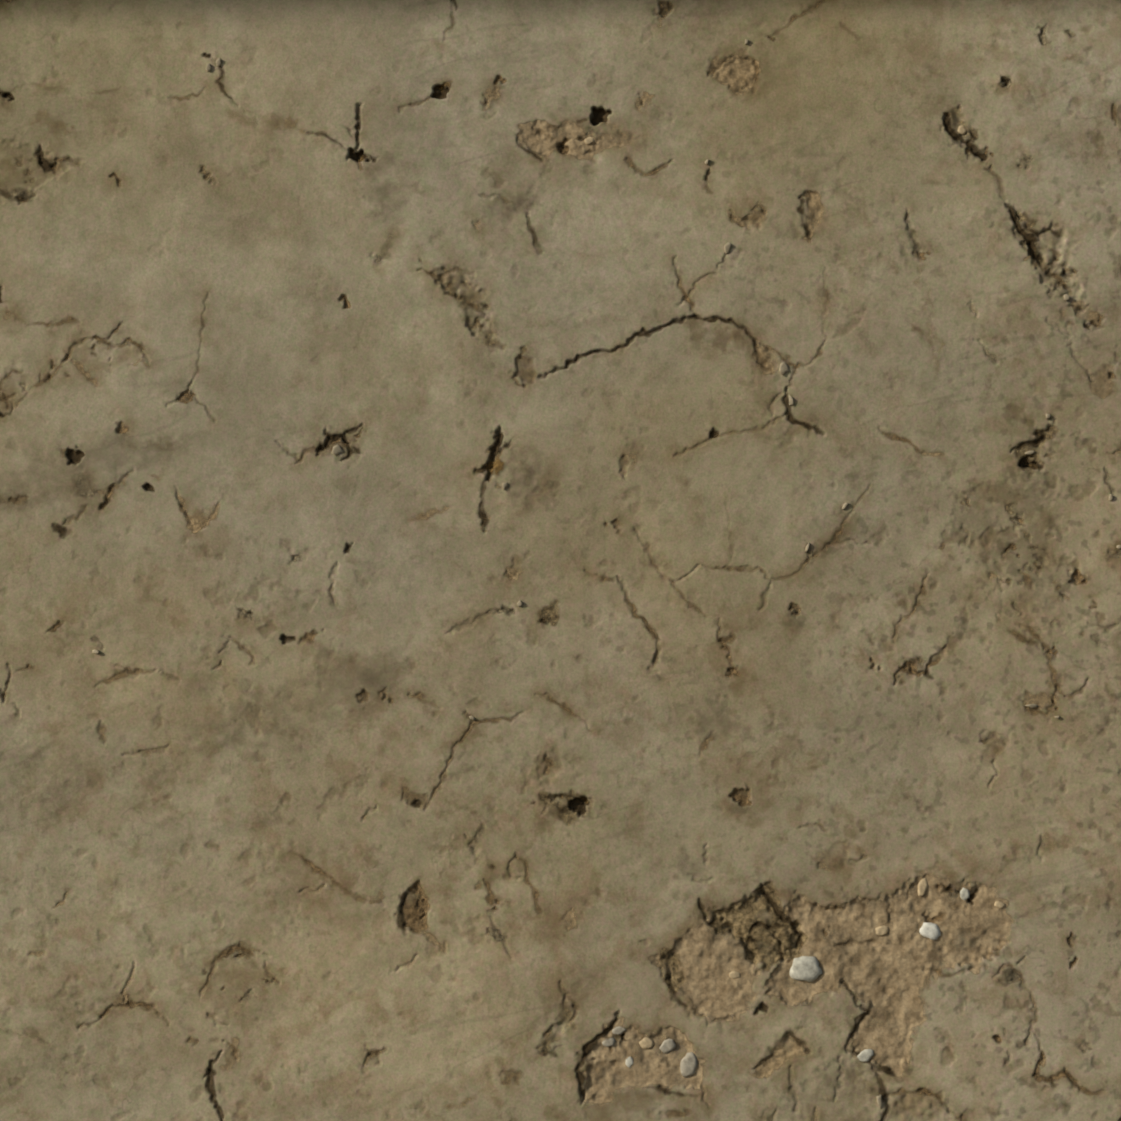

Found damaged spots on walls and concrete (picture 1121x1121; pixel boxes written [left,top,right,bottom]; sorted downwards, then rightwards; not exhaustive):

crack [174,53,232,100]
crack [314,108,375,166]
spalling [517,107,630,160]
crack [554,279,734,372]
crack [753,344,821,433]
crack [317,428,361,459]
crack [475,430,508,530]
crack [710,429,719,438]
spalling [395,882,444,951]
spalling [649,871,1013,1121]
crack [205,1037,239,1121]
spalling [576,1017,706,1118]